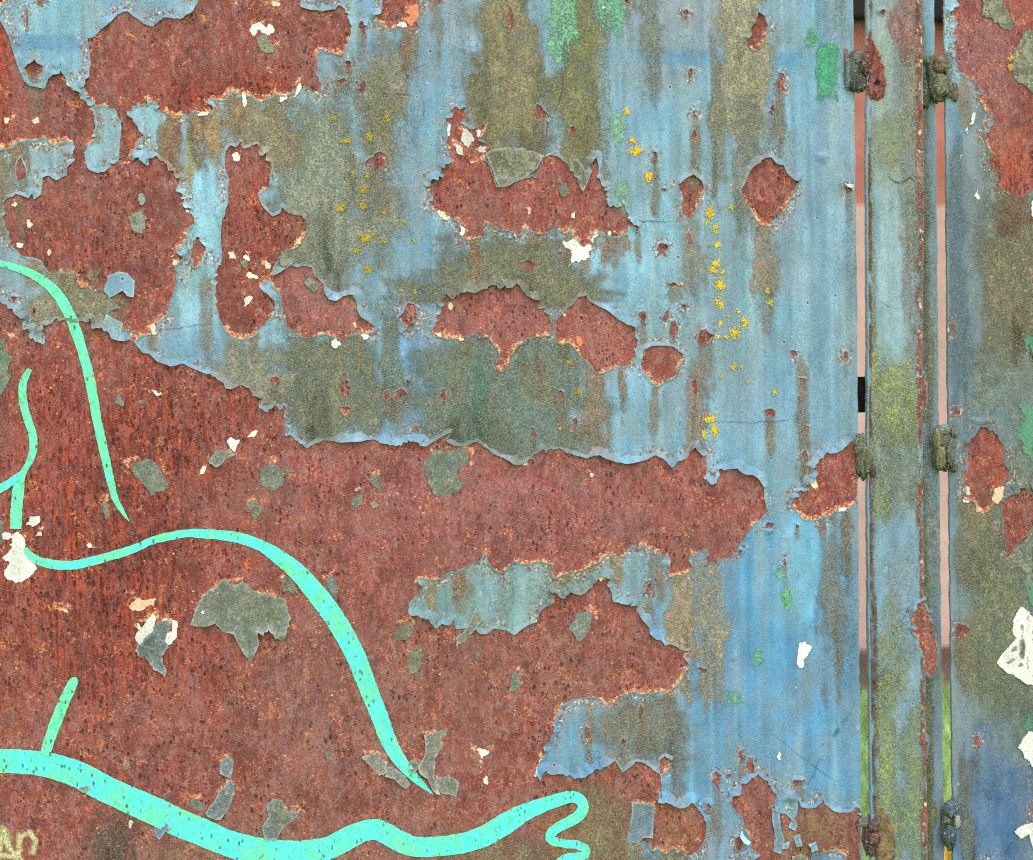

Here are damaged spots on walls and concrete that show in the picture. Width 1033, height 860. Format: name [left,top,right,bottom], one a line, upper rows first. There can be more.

peeling [21,56,45,103]
rust [943,0,1033,198]
peeling [656,241,670,257]
peeling [661,279,688,341]
rust [739,153,803,297]
rust [0,0,772,860]
rust [961,424,1033,554]
rust [729,360,878,860]
rust [907,459,940,860]
peeling [1006,615,1033,669]
peeling [702,747,756,838]
peeling [729,831,751,860]